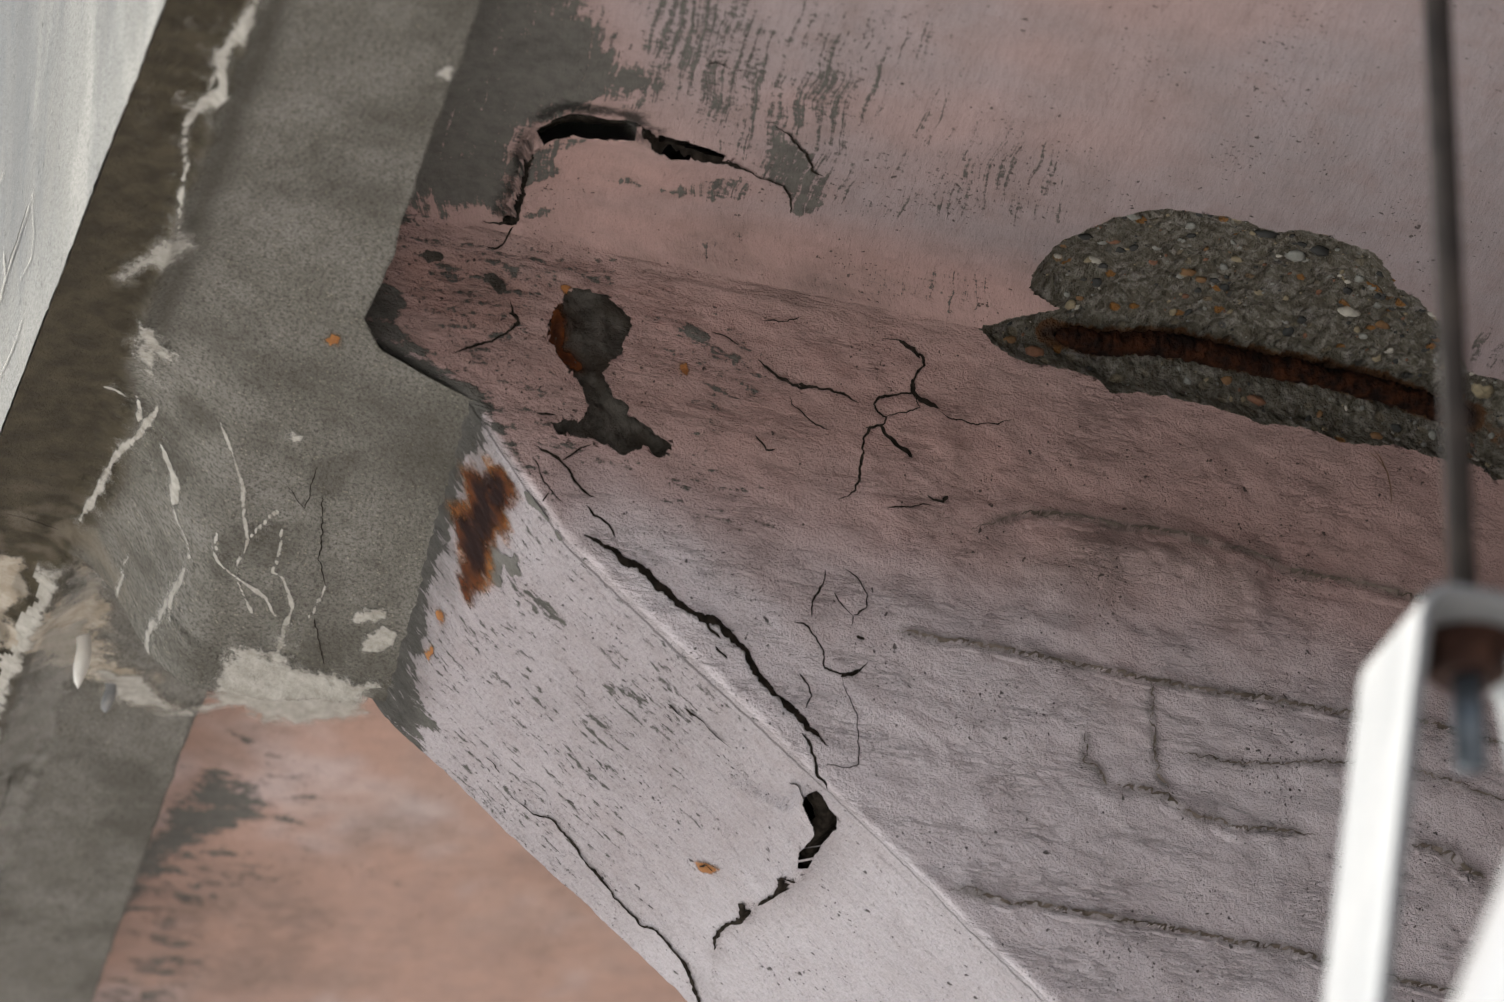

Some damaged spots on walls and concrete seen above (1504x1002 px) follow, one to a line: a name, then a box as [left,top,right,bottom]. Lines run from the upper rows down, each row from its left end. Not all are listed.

water stain [119,0,259,280]
crack [483,101,823,250]
crack [455,302,520,353]
flaking render [547,288,672,458]
crack [713,317,1011,500]
spalling [978,209,1443,458]
spalling [1468,372,1504,480]
water stain [351,609,398,652]
corrosion [447,457,522,603]
crack [533,412,868,789]
crack [888,495,948,508]